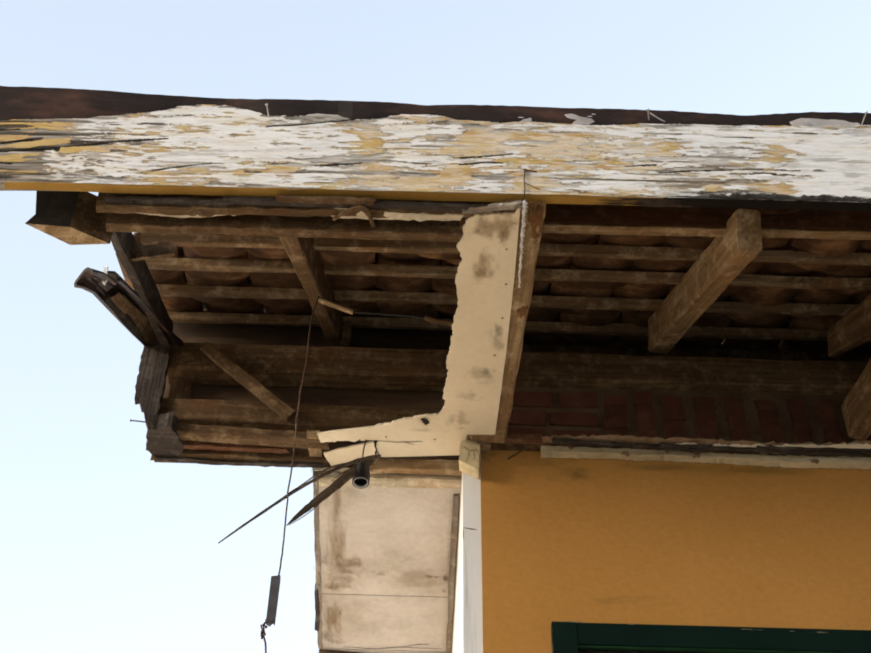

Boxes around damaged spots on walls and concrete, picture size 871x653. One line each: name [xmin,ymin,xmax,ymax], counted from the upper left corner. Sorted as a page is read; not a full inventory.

peeling [0,104,871,203]